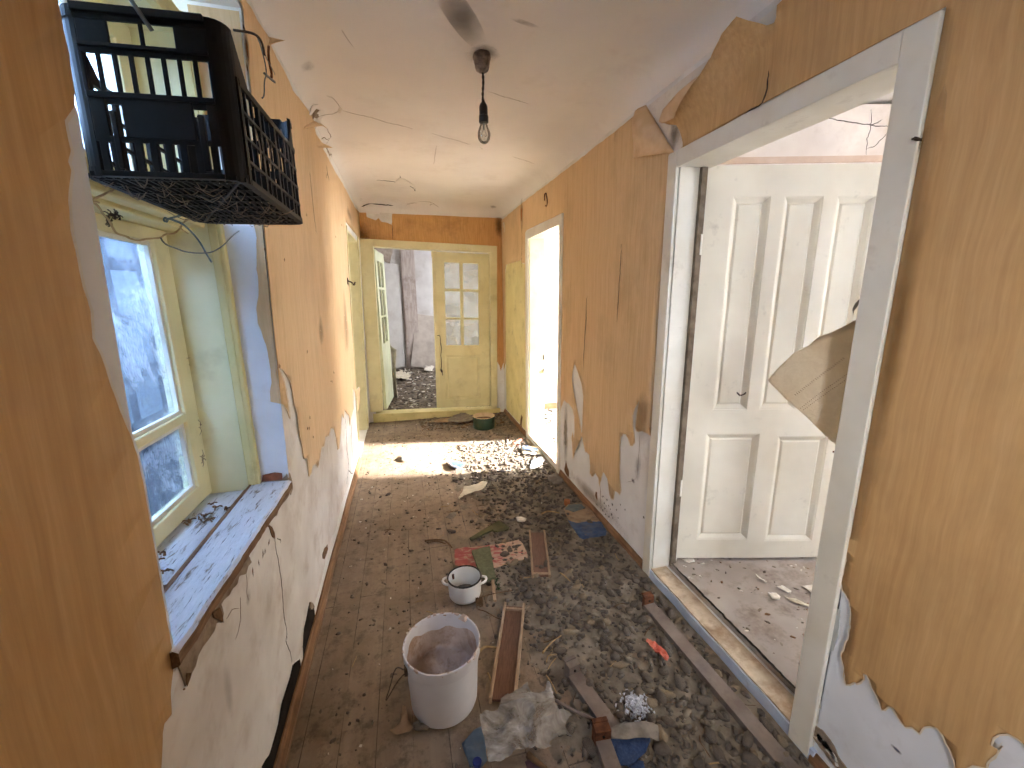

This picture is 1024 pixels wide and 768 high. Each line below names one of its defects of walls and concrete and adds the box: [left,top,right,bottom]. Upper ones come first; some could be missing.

peeling [632,59,709,158]
crack [829,113,888,149]
peeling [68,107,173,646]
peeling [161,224,360,768]
peeling [560,366,651,559]
crack [275,538,292,660]
peeling [813,558,1024,768]